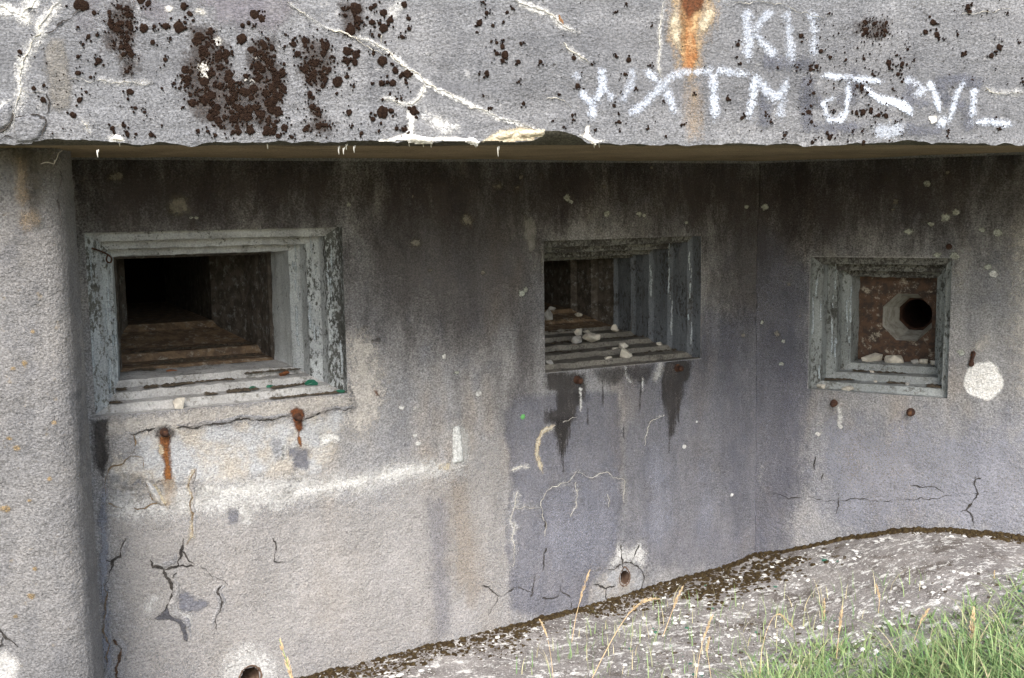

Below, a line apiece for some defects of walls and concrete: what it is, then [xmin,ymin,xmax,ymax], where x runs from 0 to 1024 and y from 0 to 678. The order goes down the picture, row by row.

crack [288,2,539,134]
corrosion [668,0,715,73]
leakage [73,160,347,232]
leakage [360,155,1020,553]
peeling [811,264,852,357]
corrosion [156,426,174,480]
crack [150,469,228,641]
crack [104,405,352,509]
corrosion [290,408,305,446]
crack [481,417,625,614]
crack [594,542,647,600]
crack [766,457,997,527]